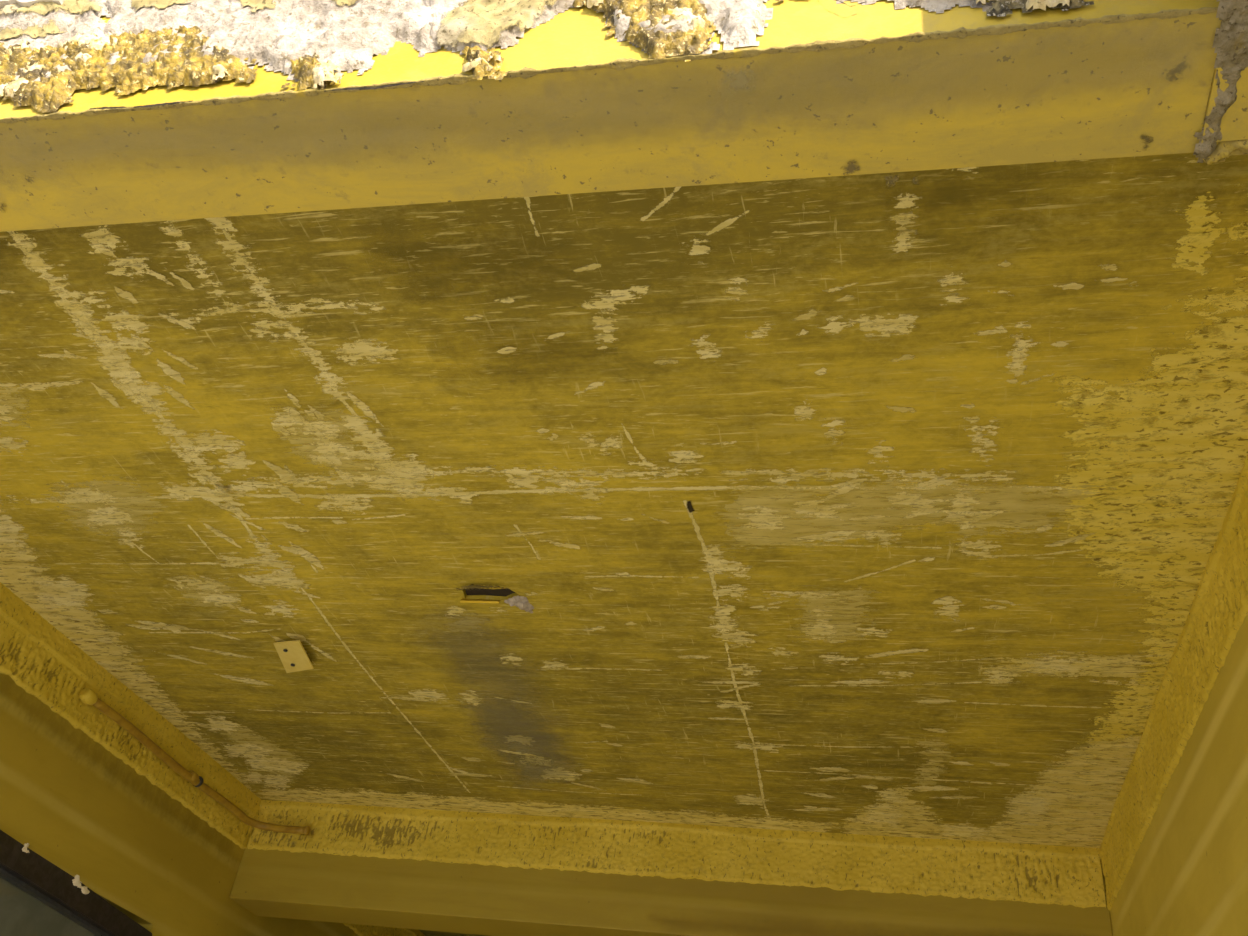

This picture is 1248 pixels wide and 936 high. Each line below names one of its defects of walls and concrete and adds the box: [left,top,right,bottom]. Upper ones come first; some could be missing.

spalling [0,0,1218,124]
spalling [1203,139,1248,165]
peeling [0,183,1248,848]